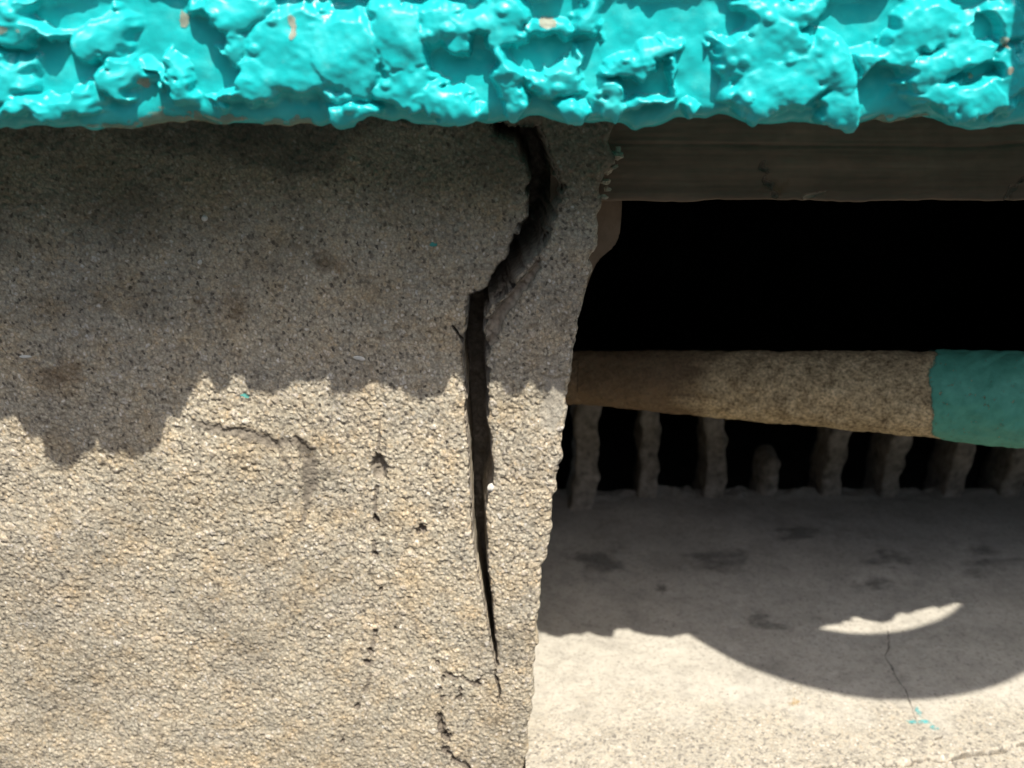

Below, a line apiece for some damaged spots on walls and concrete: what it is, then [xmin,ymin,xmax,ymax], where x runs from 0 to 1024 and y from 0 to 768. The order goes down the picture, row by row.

crack [435,122,566,768]